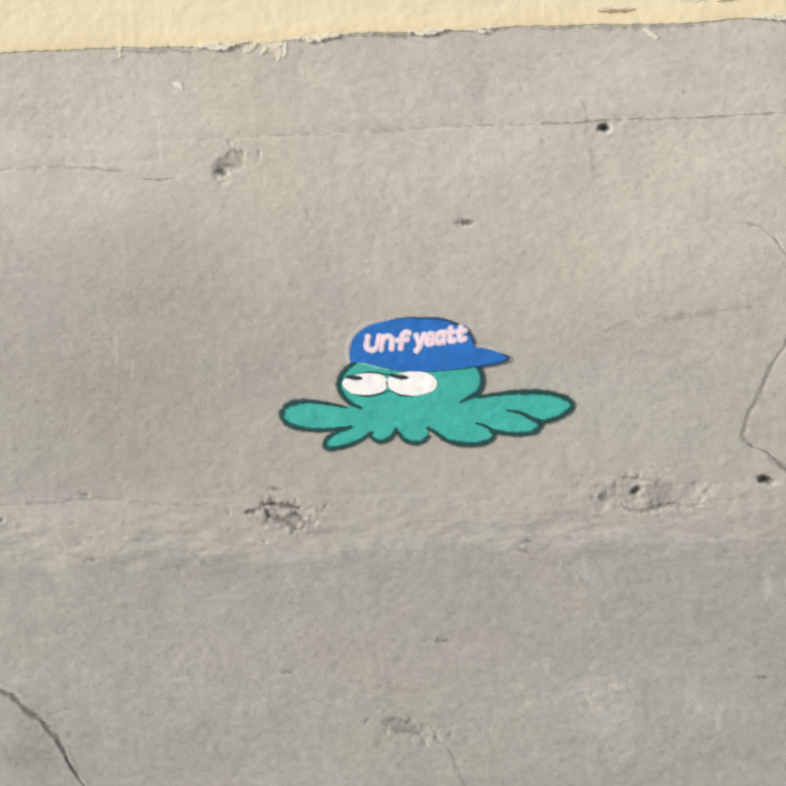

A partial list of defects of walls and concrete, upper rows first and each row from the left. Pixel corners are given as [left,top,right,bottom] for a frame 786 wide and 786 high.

peeling [407,26,454,36]
peeling [293,32,345,42]
peeling [195,40,248,50]
crack [0,689,85,786]